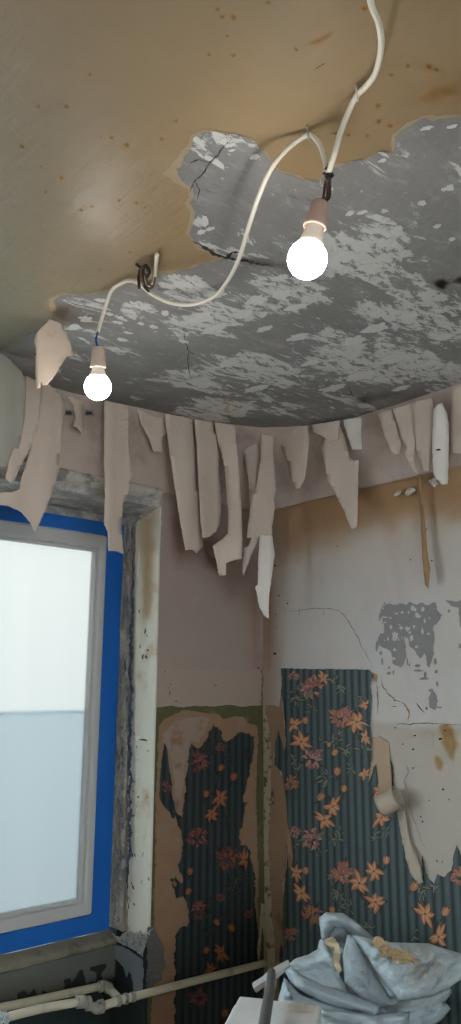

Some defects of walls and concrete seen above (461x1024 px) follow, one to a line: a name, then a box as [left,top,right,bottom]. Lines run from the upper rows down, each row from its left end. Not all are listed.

crack [190,142,228,199]
peeling [0,114,461,932]
crack [298,608,459,725]
peeling [112,928,153,992]